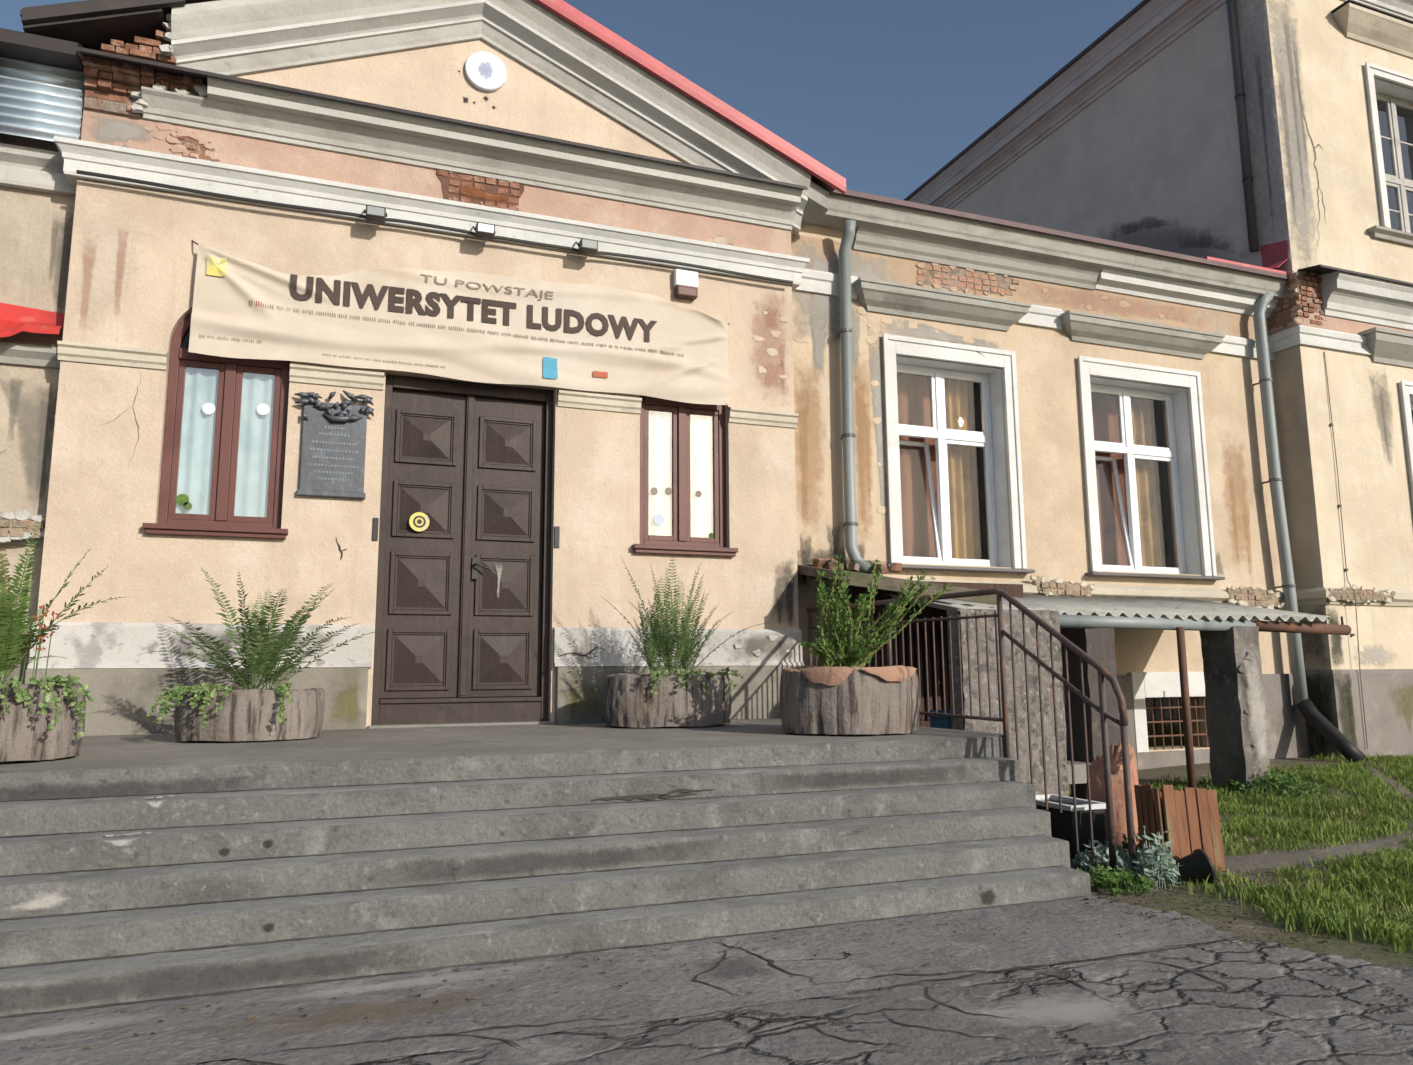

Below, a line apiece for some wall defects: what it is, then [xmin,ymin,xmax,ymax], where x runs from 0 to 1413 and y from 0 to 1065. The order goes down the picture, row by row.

flaking render [82,13,221,161]
damp [1283,53,1304,197]
crack [1280,19,1326,246]
flaking render [436,169,524,211]
damp [51,236,72,307]
flaking render [915,262,1019,296]
flaking render [1268,271,1326,334]
damp [10,388,52,485]
crack [101,380,141,459]
flaking render [0,509,46,543]
damp [774,531,865,622]
crack [853,936,1239,1018]